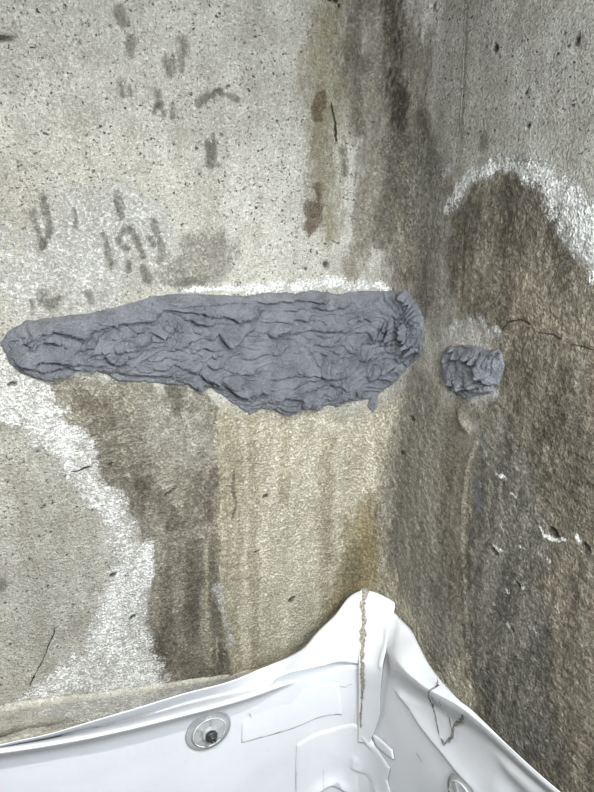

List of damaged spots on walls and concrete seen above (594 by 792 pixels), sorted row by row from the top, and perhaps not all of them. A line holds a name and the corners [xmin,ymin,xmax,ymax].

water stain [115,5,130,27]
water stain [0,180,392,318]
water stain [576,628,594,659]
water stain [19,674,247,727]
water stain [573,667,594,729]